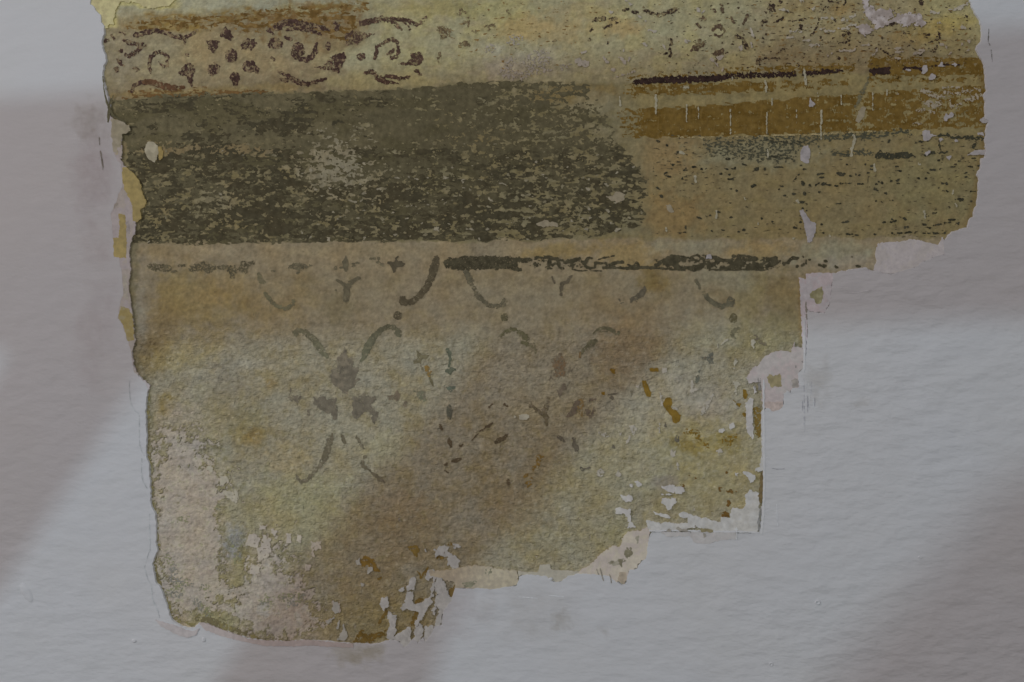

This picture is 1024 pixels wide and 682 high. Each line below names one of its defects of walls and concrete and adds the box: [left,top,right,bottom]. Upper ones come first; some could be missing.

peeling [873,237,944,274]
peeling [380,272,833,647]